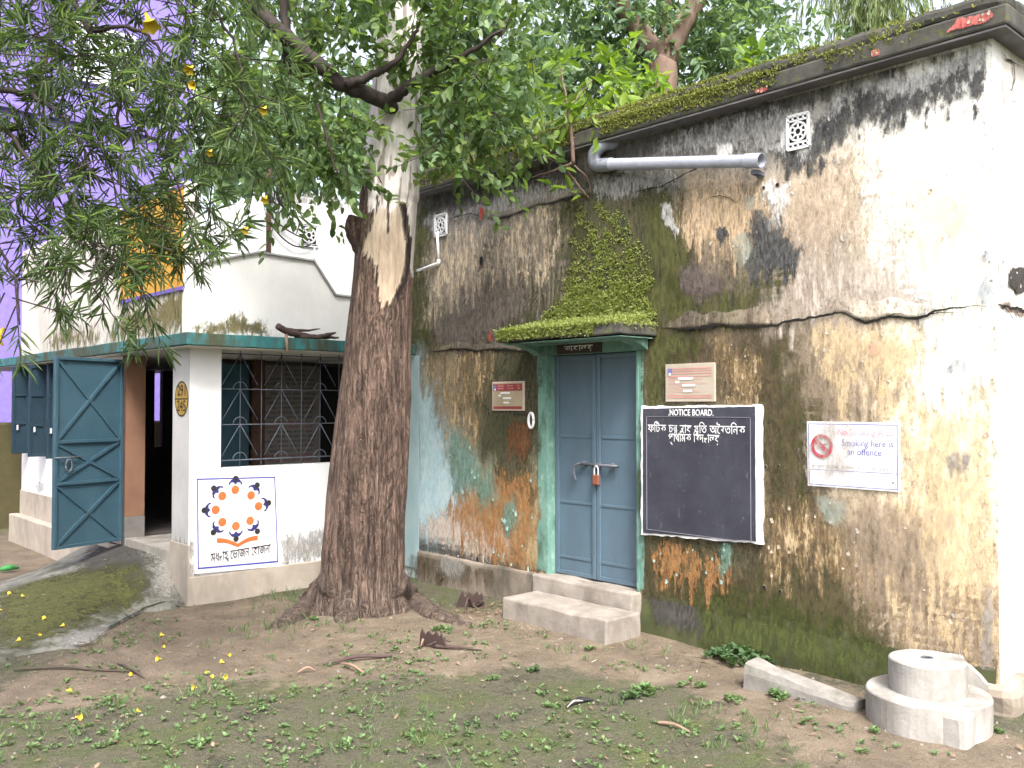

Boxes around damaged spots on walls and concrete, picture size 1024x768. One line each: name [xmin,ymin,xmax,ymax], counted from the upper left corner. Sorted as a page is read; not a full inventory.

peeling [947,10,993,32]
damp [601,49,984,181]
damp [744,209,803,306]
damp [426,155,652,505]
crack [660,304,1024,331]
rust [506,421,531,468]
damp [643,322,998,676]